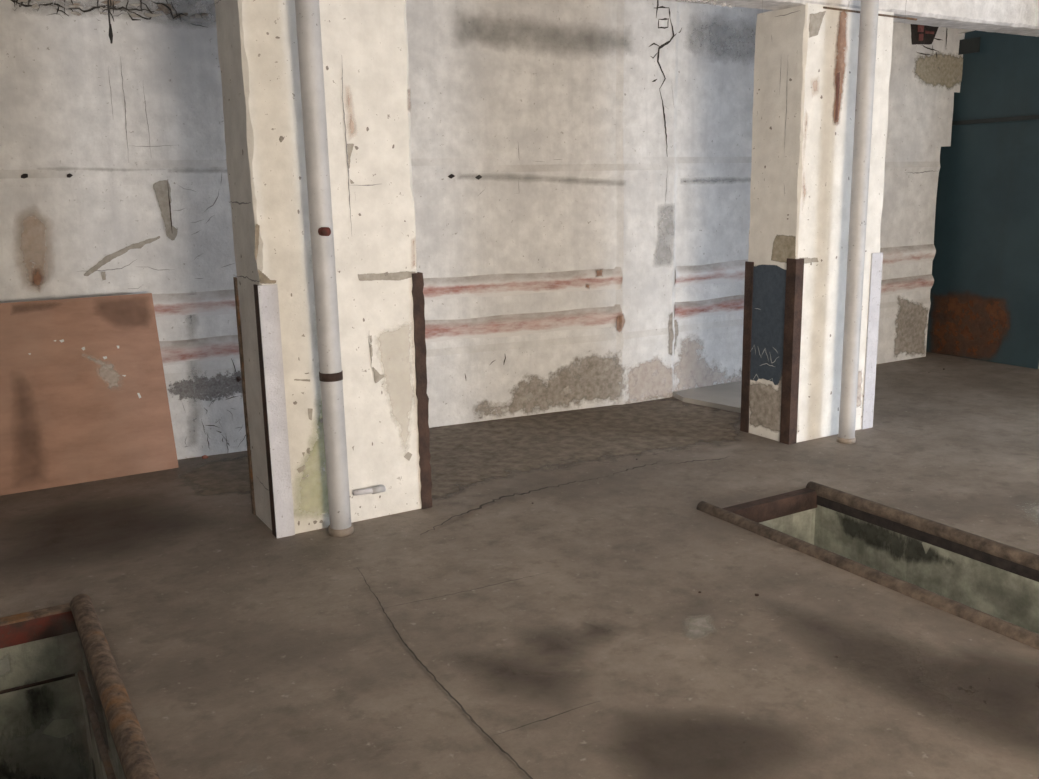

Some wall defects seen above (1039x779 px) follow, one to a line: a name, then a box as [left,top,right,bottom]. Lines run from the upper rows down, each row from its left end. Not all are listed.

spalling [11,0,215,27]
crack [649,0,682,201]
spalling [911,24,963,89]
peeling [153,180,178,240]
peeling [369,327,412,440]
peeling [475,313,782,431]